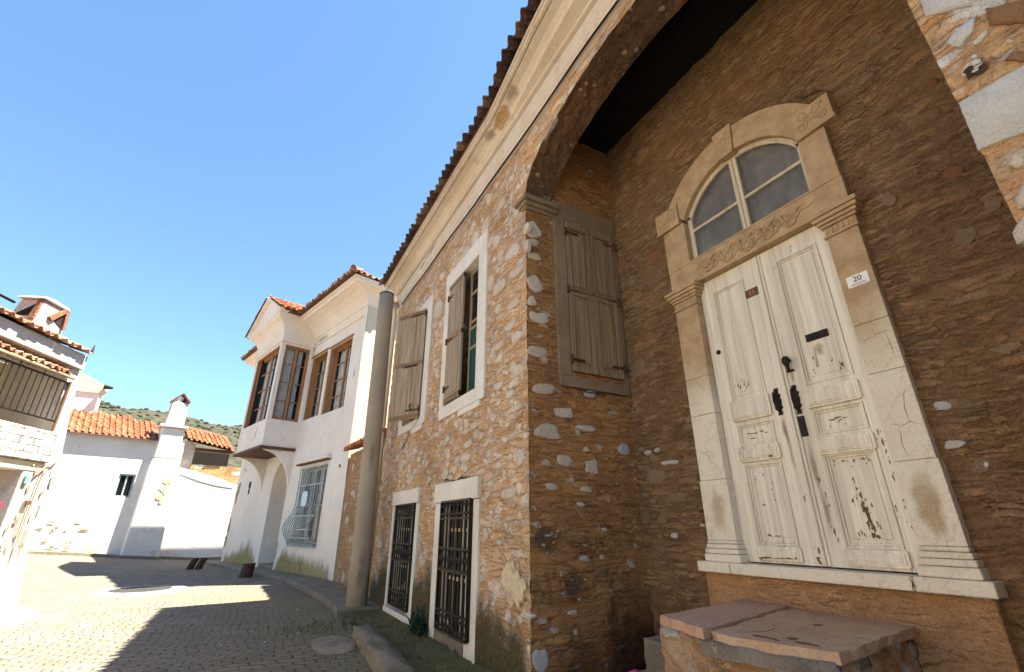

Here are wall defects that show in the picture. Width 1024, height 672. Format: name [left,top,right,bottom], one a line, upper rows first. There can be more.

crack [895,391,920,454]
peeling [833,457,887,544]